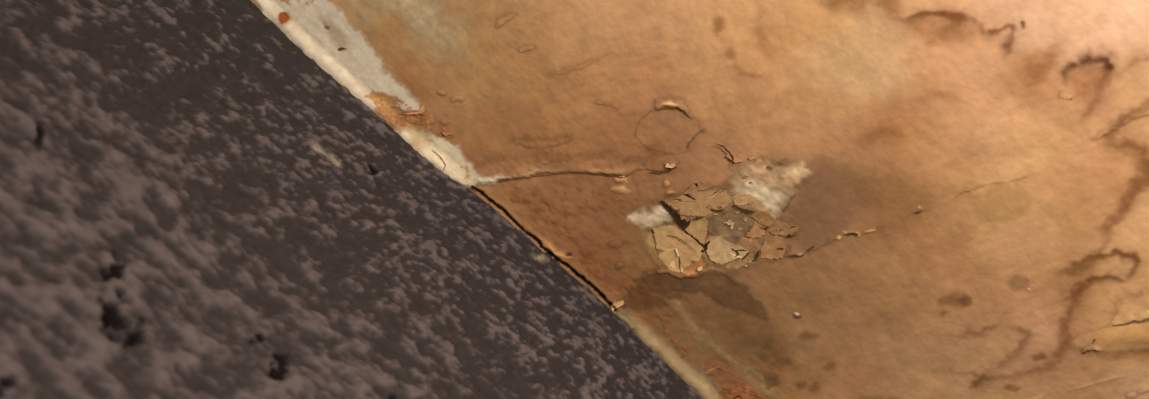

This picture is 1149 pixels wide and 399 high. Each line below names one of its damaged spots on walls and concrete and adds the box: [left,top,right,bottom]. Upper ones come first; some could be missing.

water stain [910,11,967,31]
water stain [988,21,1025,47]
water stain [1063,55,1113,85]
peeling [394,97,706,186]
spalling [627,143,810,278]
water stain [1106,141,1149,228]
water stain [1071,249,1141,309]
water stain [623,270,781,399]